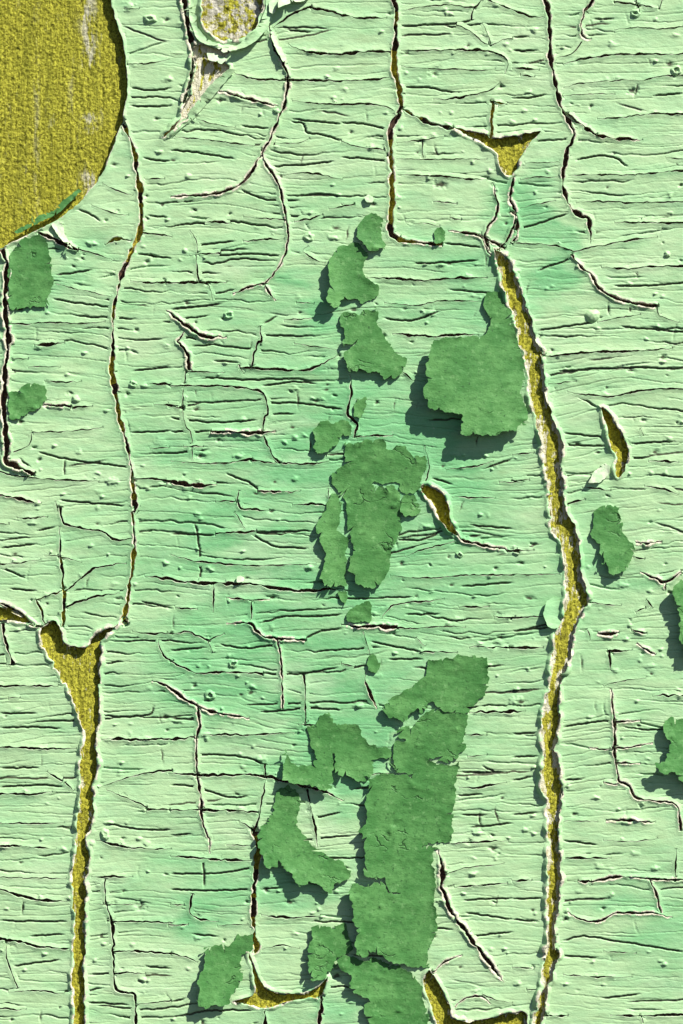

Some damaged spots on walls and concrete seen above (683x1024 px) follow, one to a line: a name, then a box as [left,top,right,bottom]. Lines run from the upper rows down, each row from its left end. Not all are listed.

peeling [0,0,132,310]
peeling [158,0,266,141]
crack [0,0,683,709]
peeling [326,213,407,380]
peeling [448,124,545,180]
crack [0,934,70,1014]
crack [0,743,76,799]
peeling [0,603,128,1024]
crack [90,674,344,1024]
peeling [197,247,635,1024]
crack [432,836,568,1021]
crack [563,539,683,982]